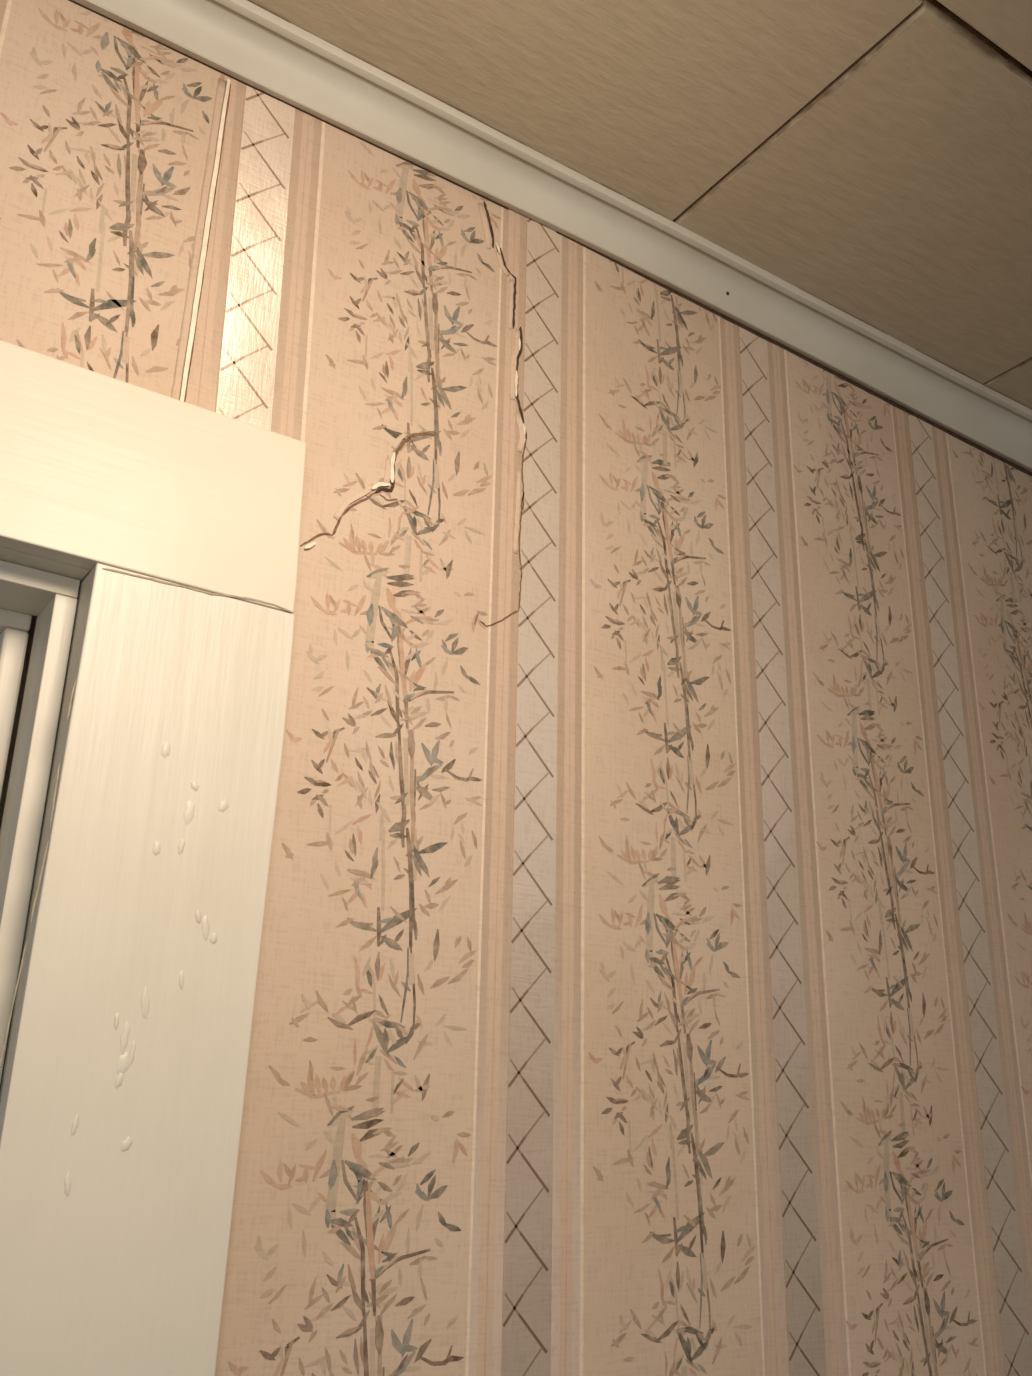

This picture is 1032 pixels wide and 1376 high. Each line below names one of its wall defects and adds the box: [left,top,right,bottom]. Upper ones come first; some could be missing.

crack [69,0,528,627]
crack [556,231,1032,477]